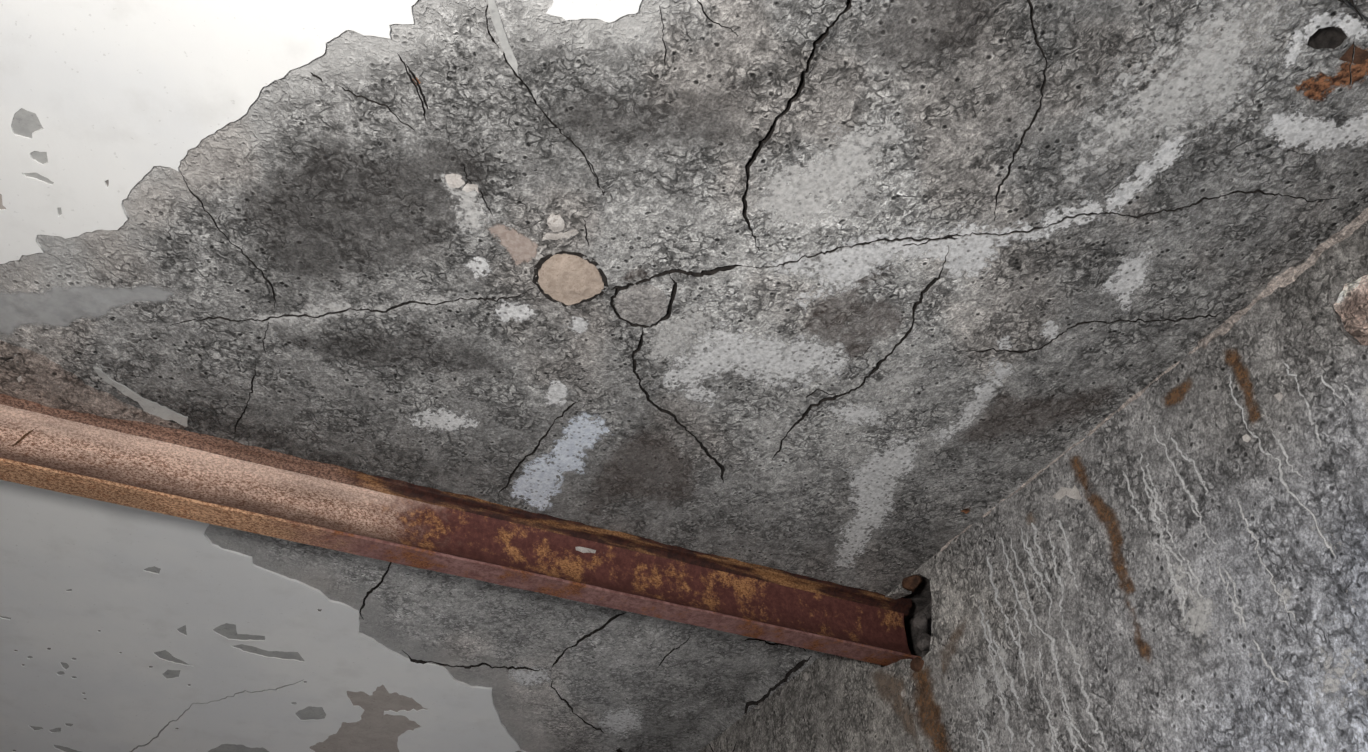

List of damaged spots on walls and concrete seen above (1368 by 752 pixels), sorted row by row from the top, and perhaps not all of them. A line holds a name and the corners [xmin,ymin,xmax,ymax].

crack [310,53,428,131]
rust [1295,44,1368,100]
crack [170,164,535,434]
damp [238,256,492,327]
efflorescence [441,174,492,232]
damp [493,299,536,323]
peeling [0,0,1368,595]
crack [610,0,1337,483]
rust [1072,456,1134,605]
peeling [149,650,190,686]
peeling [204,524,825,752]
rust [874,627,963,752]